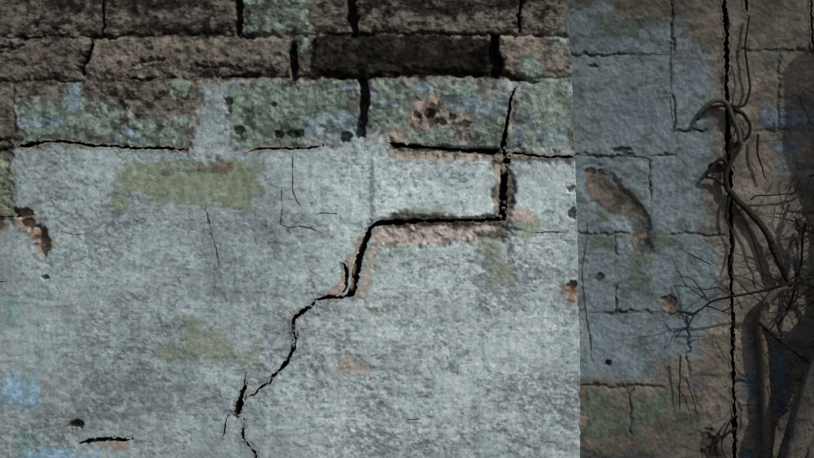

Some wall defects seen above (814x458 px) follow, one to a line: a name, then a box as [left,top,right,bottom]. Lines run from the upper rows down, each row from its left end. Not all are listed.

crack [18,137,188,153]
spalling [386,95,535,187]
spalling [16,210,55,255]
spalling [323,199,536,298]
crack [221,83,668,458]
spalling [584,168,652,255]
crack [570,0,751,458]
crack [78,435,132,446]